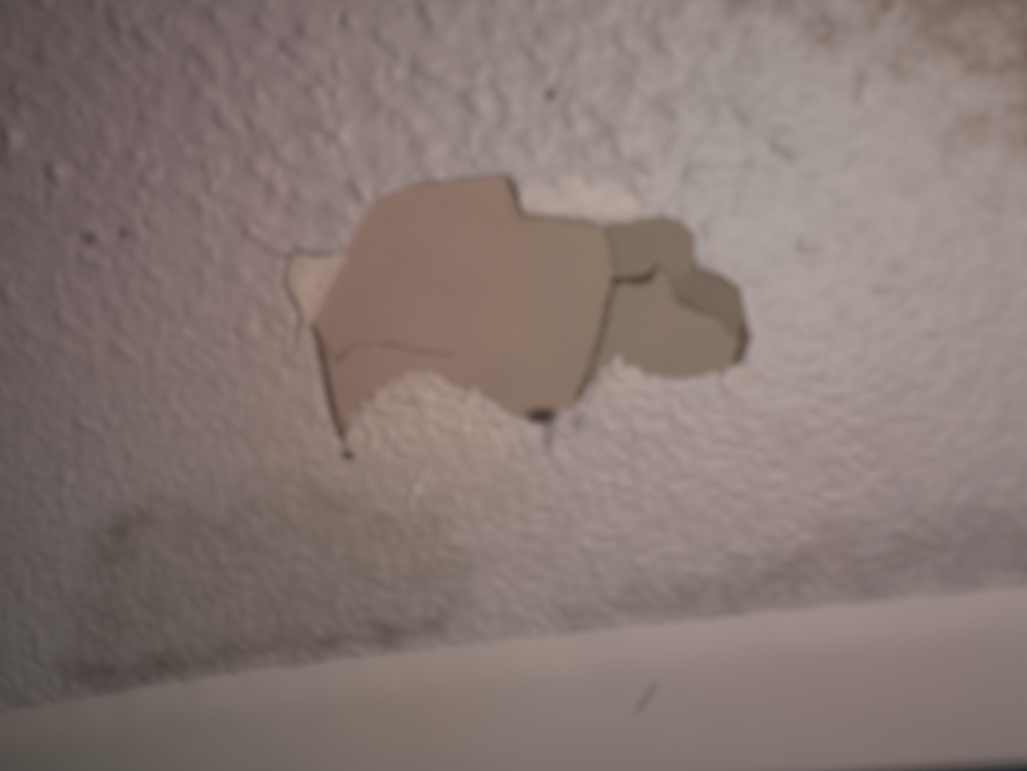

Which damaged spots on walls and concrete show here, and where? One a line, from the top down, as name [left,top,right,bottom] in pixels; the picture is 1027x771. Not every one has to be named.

peeling [285,176,750,439]